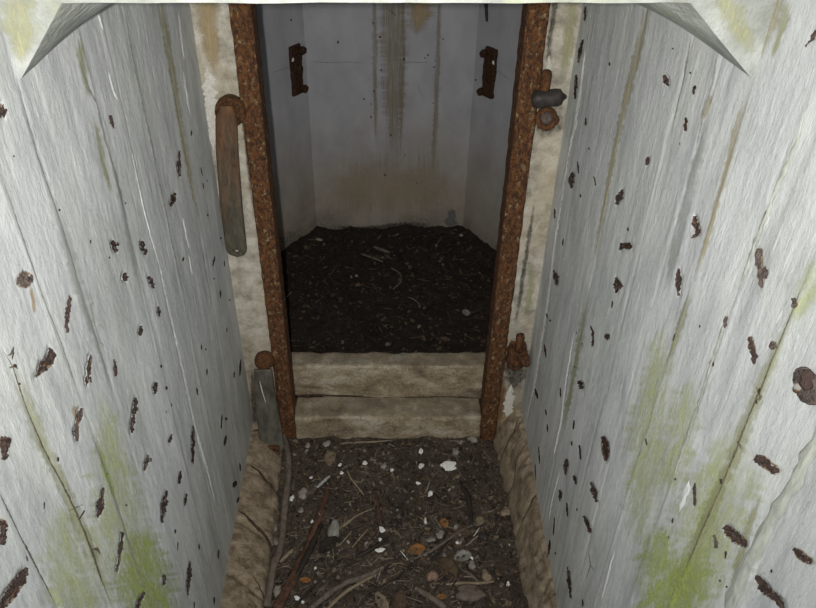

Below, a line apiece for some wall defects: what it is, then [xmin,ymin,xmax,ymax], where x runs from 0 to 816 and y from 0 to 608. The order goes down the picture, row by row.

leakage [411,3,440,30]
corrosion [792,369,814,393]